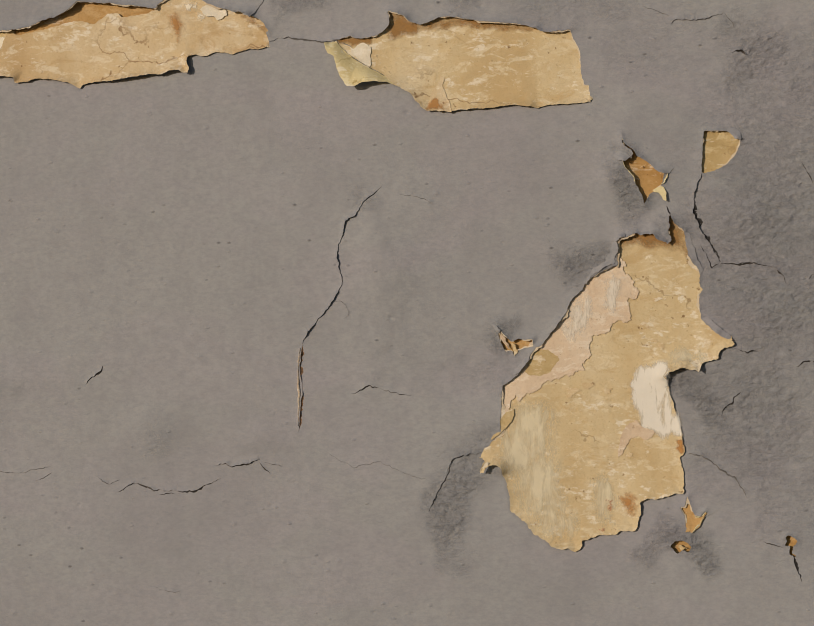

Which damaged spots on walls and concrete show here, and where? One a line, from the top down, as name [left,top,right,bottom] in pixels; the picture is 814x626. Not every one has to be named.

peeling [0,0,279,88]
peeling [324,0,601,112]
crack [643,0,751,55]
peeling [689,118,750,182]
crack [663,171,794,283]
crack [293,182,382,432]
peeling [474,127,745,565]
crack [347,378,412,396]
crack [0,458,52,481]
crack [97,451,283,495]
crack [419,440,485,512]
crack [684,445,754,498]